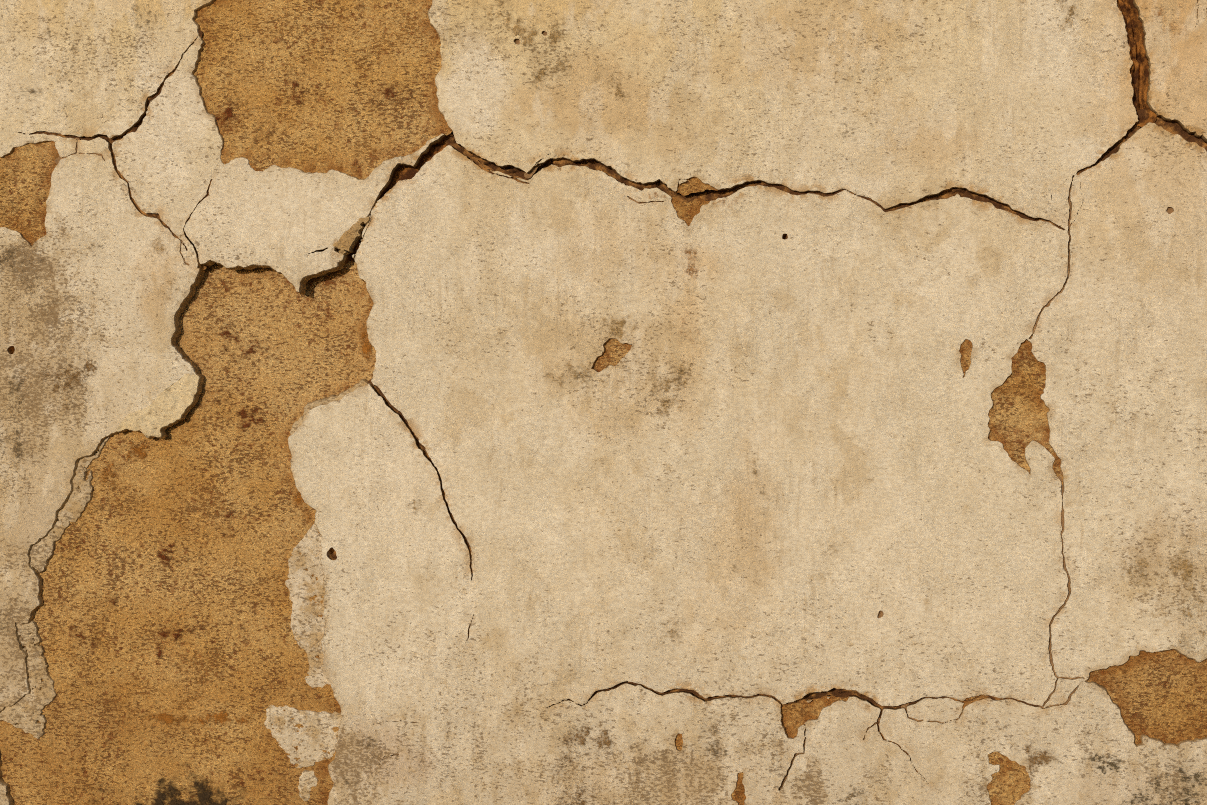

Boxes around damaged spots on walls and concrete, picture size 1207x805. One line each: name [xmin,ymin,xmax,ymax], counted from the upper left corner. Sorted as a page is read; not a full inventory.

flaking render [0,141,59,245]
crack [19,30,212,270]
flaking render [194,0,452,179]
crack [317,225,366,261]
crack [383,0,1207,341]
flaking render [0,261,376,805]
crack [368,379,473,577]
flaking render [988,336,1063,485]
flaking render [778,696,849,738]
crack [552,471,1087,790]
flaking render [987,751,1030,805]
flaking render [1087,649,1207,745]